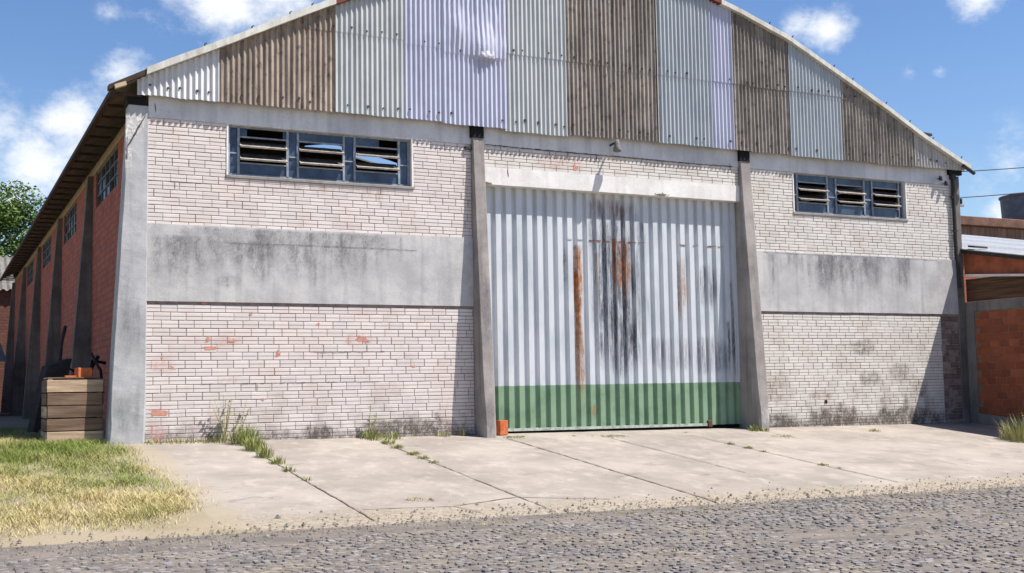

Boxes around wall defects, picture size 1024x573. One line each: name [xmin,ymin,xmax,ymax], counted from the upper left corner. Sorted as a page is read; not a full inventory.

rust [611,239,631,293]
rust [573,247,585,383]
water stain [812,403,857,426]
water stain [877,398,928,424]